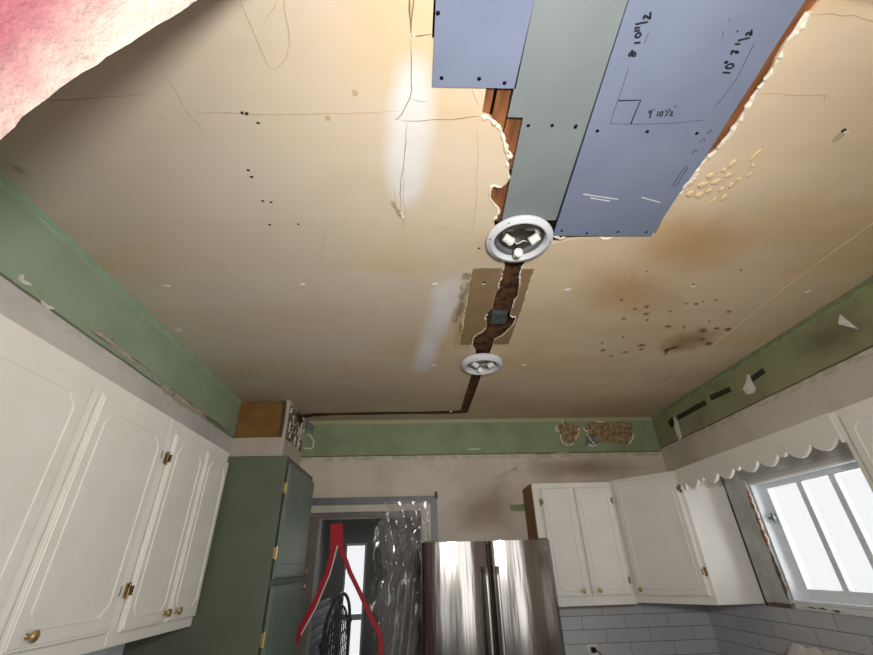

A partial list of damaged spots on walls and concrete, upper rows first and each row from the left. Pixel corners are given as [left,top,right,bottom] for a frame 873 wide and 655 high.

crack [814,13,873,22]
crack [166,0,480,234]
peeling [481,113,513,221]
spalling [555,420,634,447]